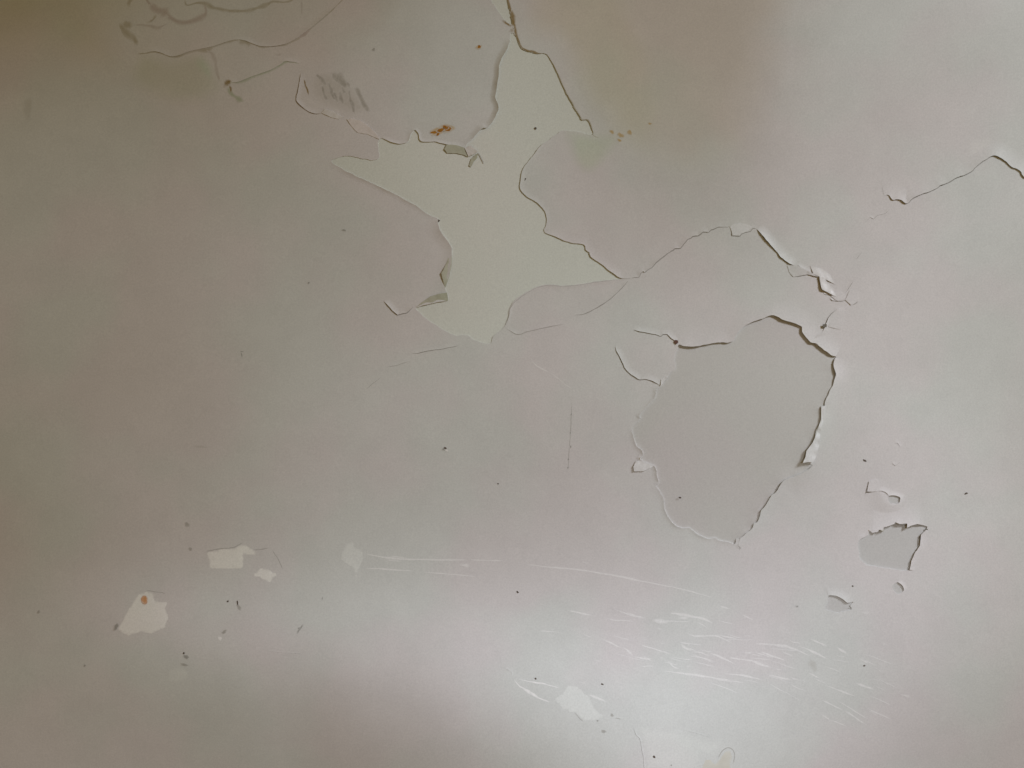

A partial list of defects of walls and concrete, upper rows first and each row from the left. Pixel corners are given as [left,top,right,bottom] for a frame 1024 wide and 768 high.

corrosion [430,124,456,136]
peeling [321,0,630,344]
crack [880,140,1024,204]
peeling [628,297,852,550]
peeling [855,498,931,594]